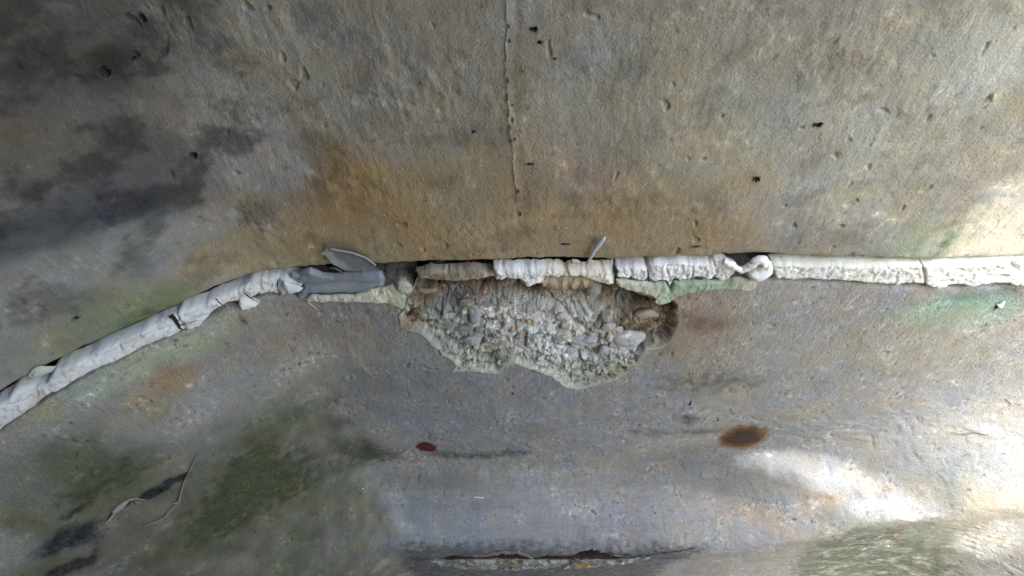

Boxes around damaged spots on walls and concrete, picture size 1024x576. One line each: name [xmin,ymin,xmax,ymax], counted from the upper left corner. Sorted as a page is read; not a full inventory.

spalling [399,259,680,390]
rust [417,442,437,452]
rust [721,426,768,448]
crack [43,472,191,576]